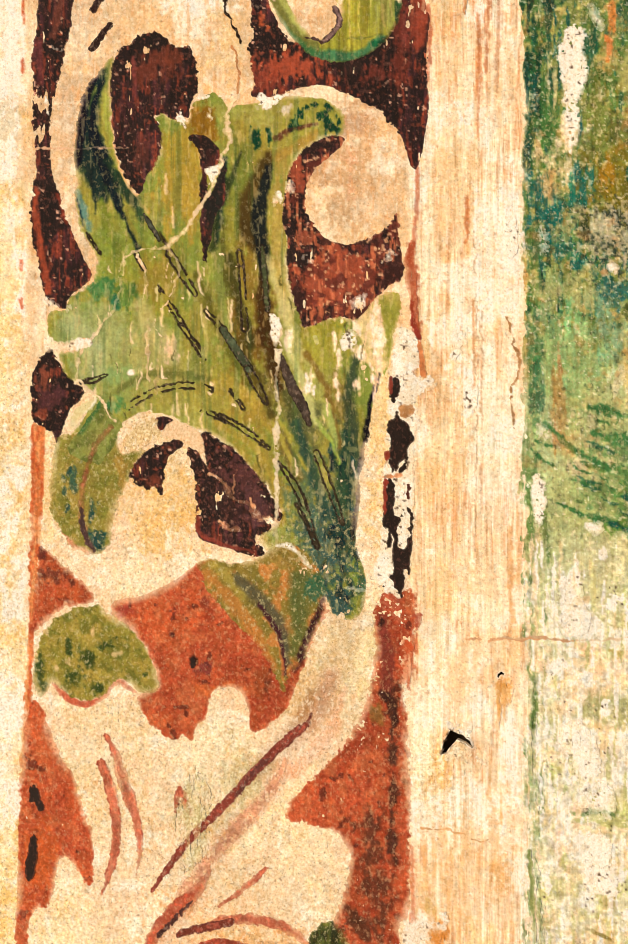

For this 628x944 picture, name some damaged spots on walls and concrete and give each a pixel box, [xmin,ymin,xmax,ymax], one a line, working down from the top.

crack [74,0,242,422]
peeling [349,292,368,310]
spalling [373,240,437,599]
peeling [556,2,605,158]